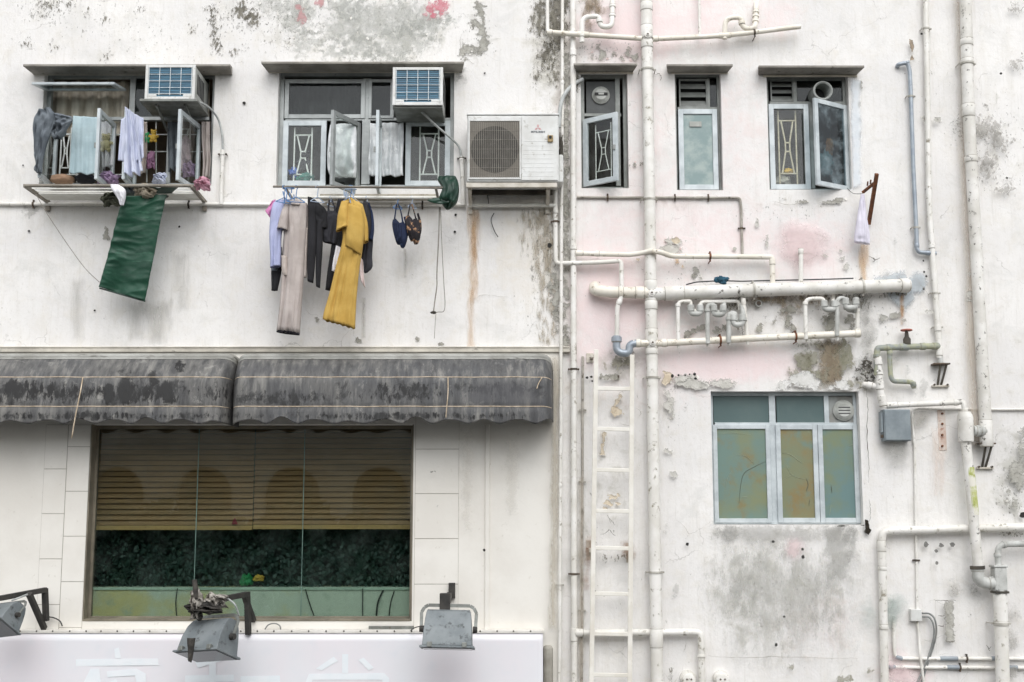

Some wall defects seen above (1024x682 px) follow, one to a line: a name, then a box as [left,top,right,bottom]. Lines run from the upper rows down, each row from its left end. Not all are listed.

peeling [457,0,491,64]
damp [528,0,570,90]
damp [521,209,556,342]
peeling [590,373,629,426]
spalling [661,371,738,422]